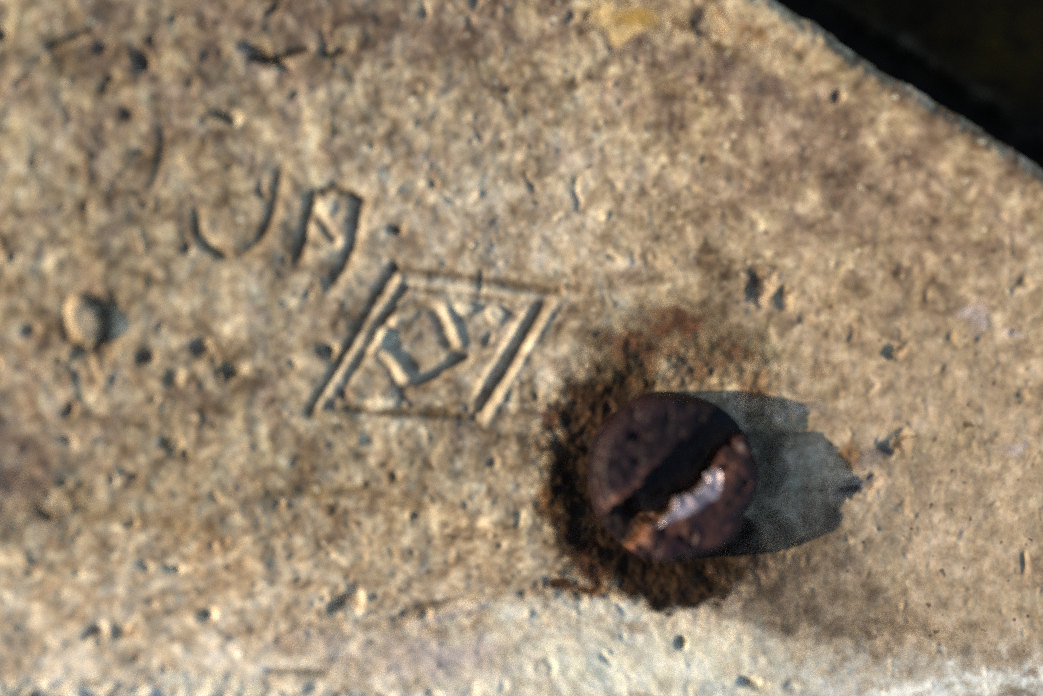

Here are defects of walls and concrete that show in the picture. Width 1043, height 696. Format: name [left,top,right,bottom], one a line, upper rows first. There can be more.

rust [535,304,766,616]